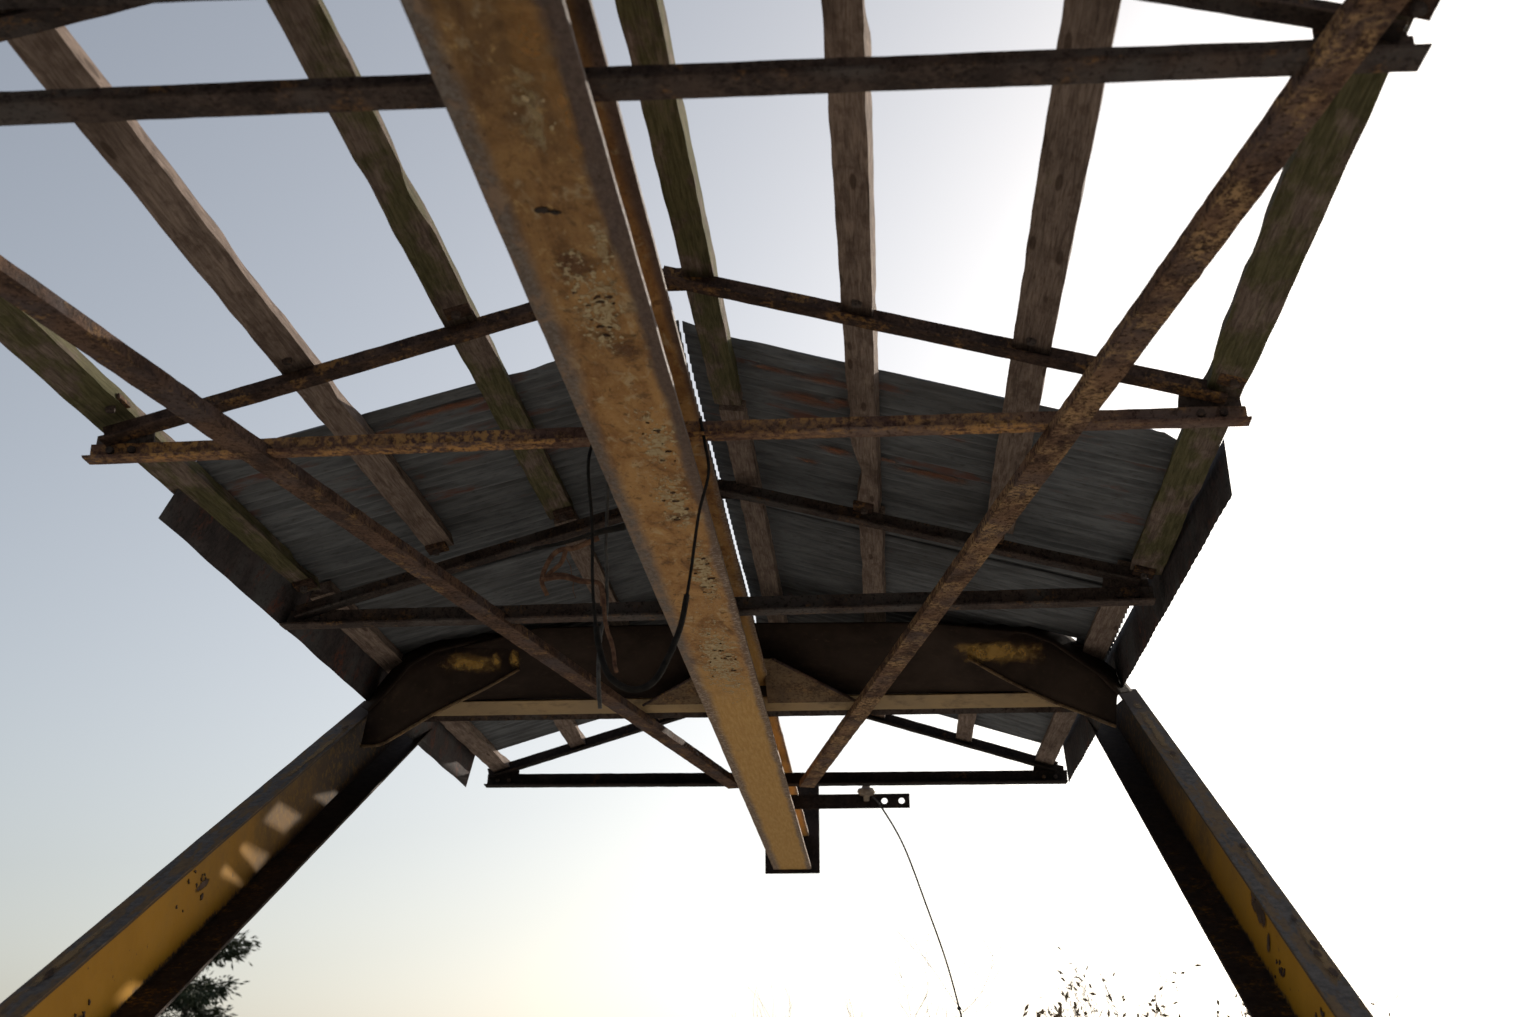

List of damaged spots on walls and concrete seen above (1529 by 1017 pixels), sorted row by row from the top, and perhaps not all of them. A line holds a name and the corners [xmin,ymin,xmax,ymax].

peeling [1291,915,1340,979]